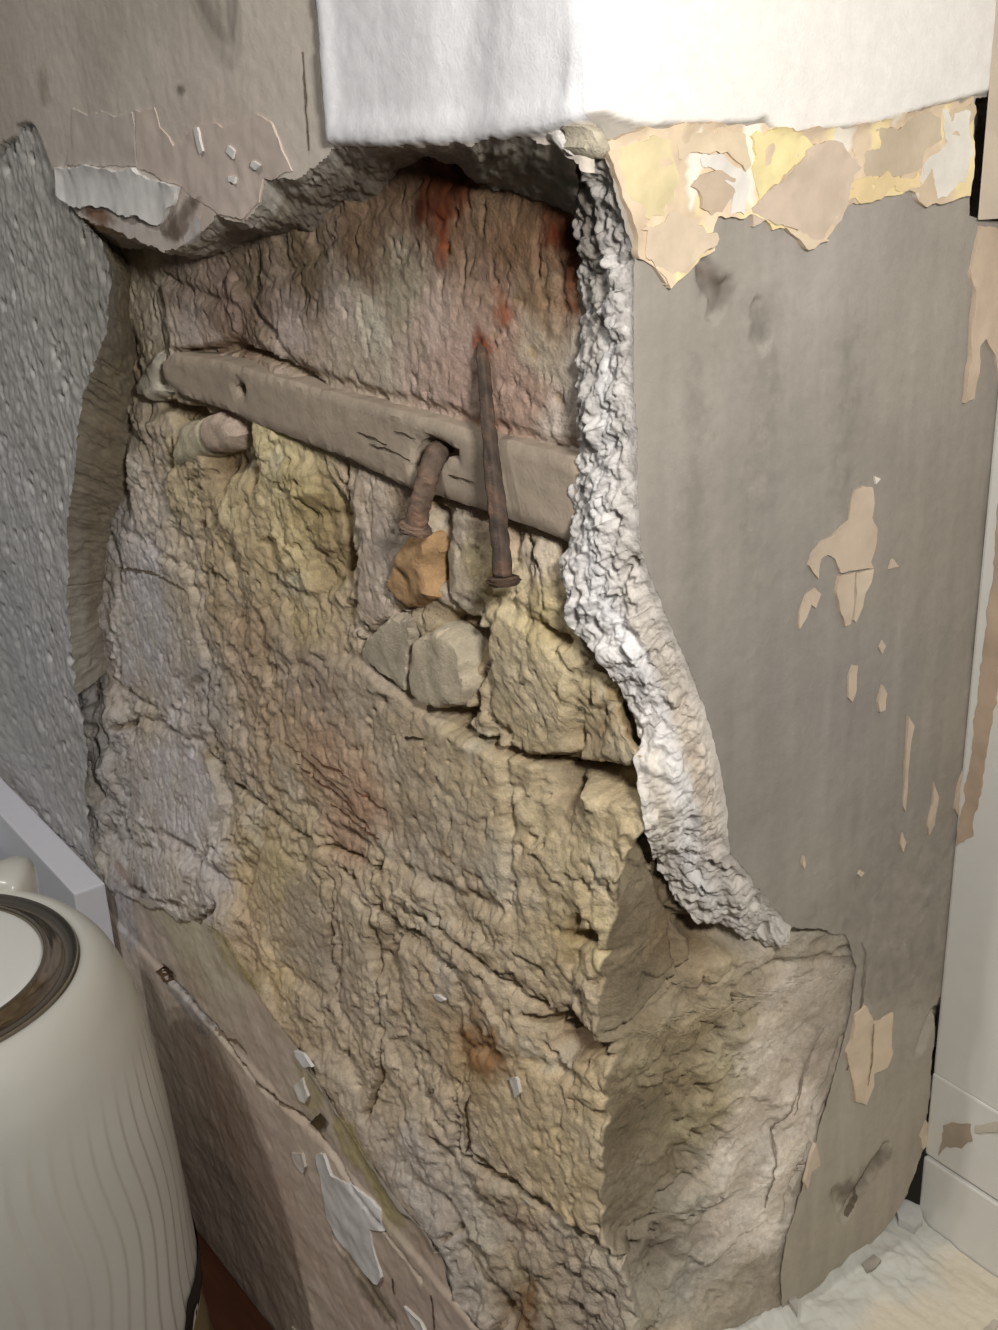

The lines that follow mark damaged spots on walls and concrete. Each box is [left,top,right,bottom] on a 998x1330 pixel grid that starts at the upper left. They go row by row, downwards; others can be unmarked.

rust [416,162,470,253]
peeling [605,96,988,289]
peeling [962,219,998,403]
peeling [798,476,899,630]
spalling [54,107,856,1330]
peeling [847,665,858,702]
peeling [901,716,915,811]
peeling [926,771,962,836]
peeling [844,1005,894,1105]
spalling [931,995,941,1079]
spalling [862,1254,881,1274]
spalling [895,1199,923,1234]